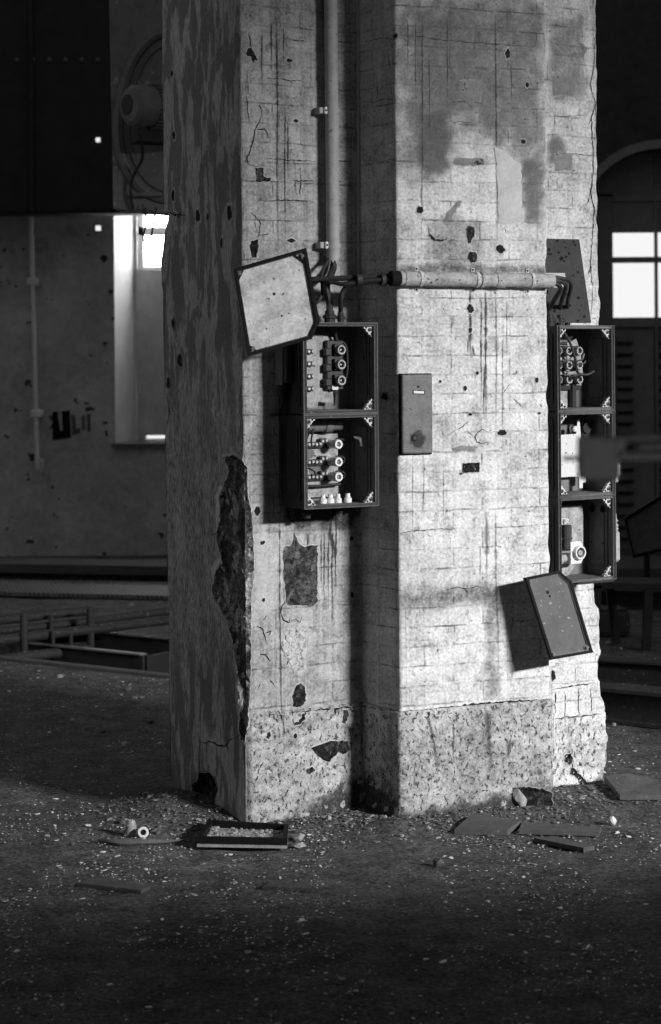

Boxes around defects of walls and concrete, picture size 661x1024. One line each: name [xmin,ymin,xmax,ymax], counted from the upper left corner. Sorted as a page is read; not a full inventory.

water stain [408,7,542,174]
crack [246,72,316,236]
water stain [523,138,564,221]
spalling [211,451,266,744]
spalling [282,531,319,608]
flaking render [282,627,307,740]
spalling [192,771,218,804]
crack [198,736,239,767]
spalling [305,740,350,775]